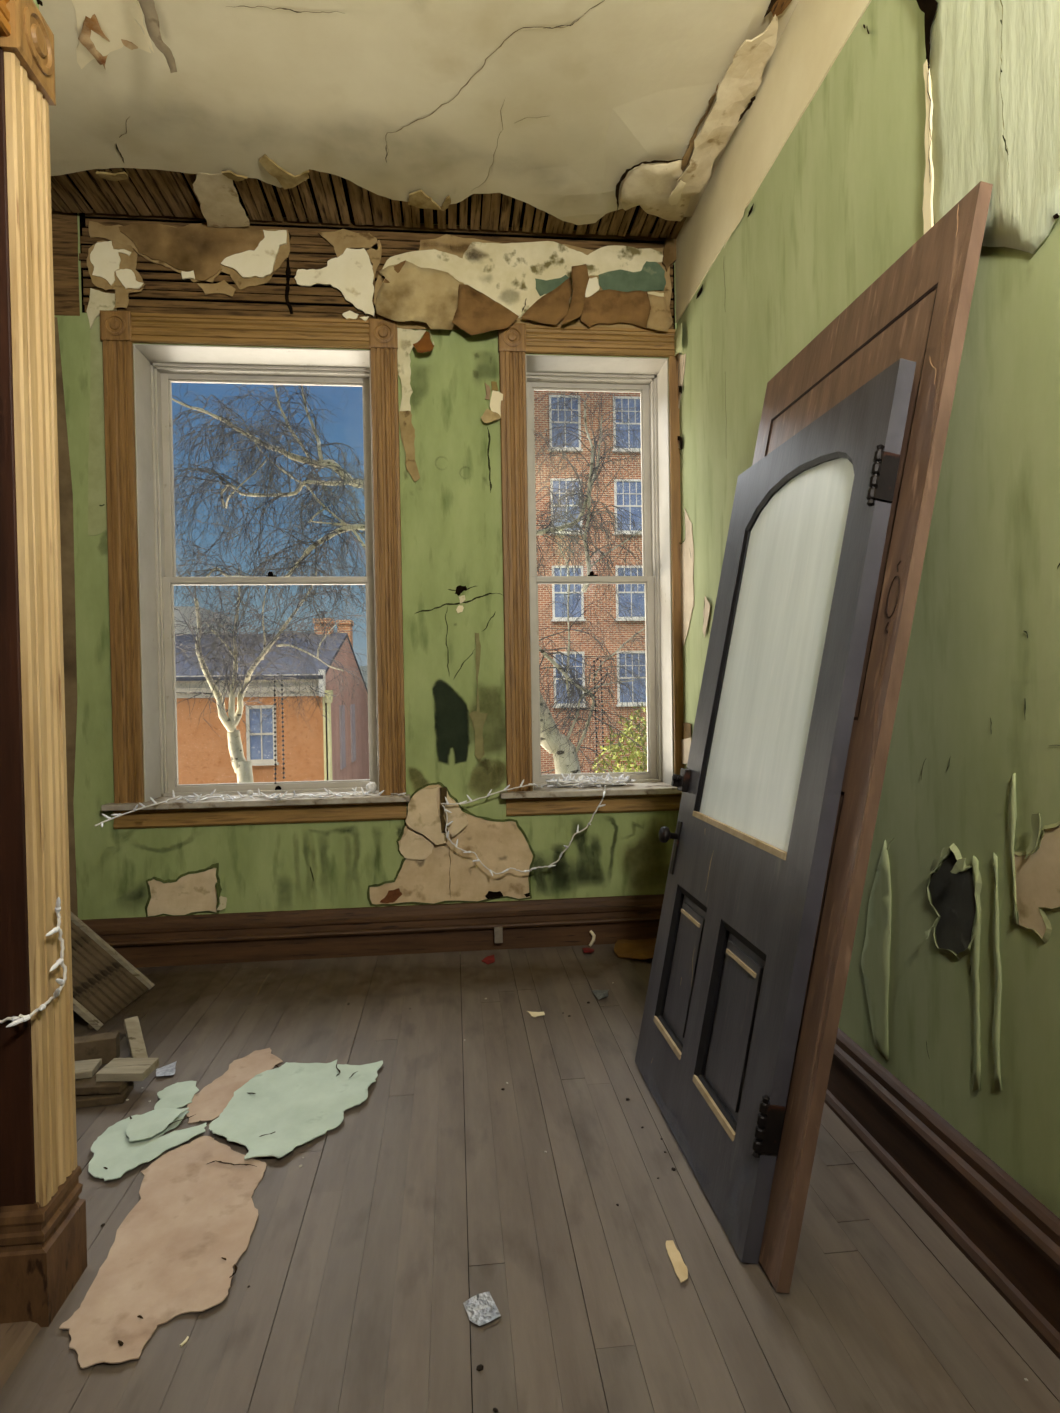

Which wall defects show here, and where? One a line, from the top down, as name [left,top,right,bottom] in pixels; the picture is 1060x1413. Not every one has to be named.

flaking render [51,0,792,329]
crack [385,1,603,162]
peeling [930,0,1060,254]
peeling [397,328,434,482]
peeling [669,263,686,406]
peeling [679,508,711,646]
water stain [433,680,469,764]
peeling [682,722,692,764]
peeling [145,863,227,917]
flaking render [367,782,535,907]
peeling [861,838,894,1061]
peeling [930,773,1060,1091]